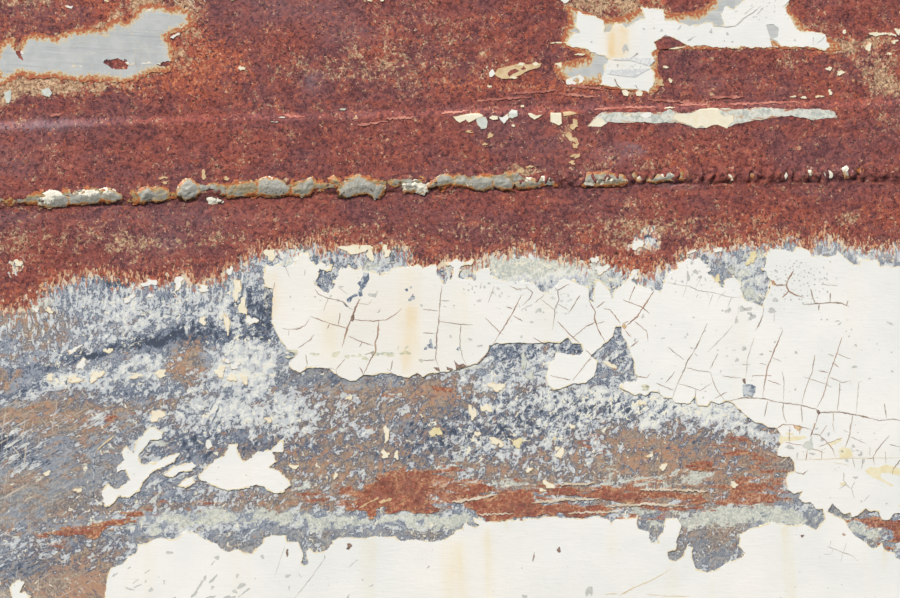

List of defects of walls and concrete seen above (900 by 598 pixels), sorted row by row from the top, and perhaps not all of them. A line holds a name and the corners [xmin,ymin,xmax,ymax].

peeling [0,0,205,103]
peeling [551,0,841,96]
corrosion [0,0,900,312]
peeling [588,107,838,128]
peeling [0,225,900,598]
crack [274,267,900,502]
corrosion [345,470,440,519]
corrosion [452,482,716,522]
corrosion [686,461,715,471]